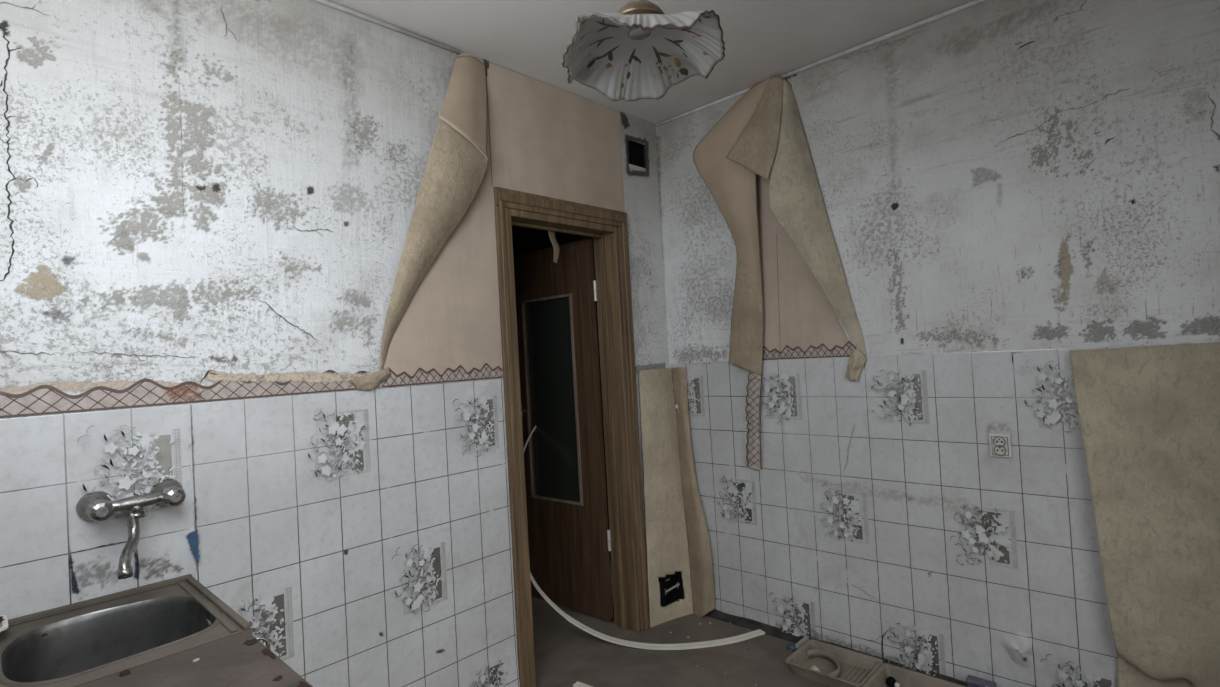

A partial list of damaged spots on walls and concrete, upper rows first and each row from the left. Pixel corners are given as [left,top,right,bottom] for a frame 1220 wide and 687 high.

crack [0,2,50,281]
crack [0,350,192,361]
peeling [98,51,237,260]
peeling [330,56,489,371]
peeling [672,76,867,376]
peeling [1033,236,1167,342]
peeling [1181,316,1220,335]